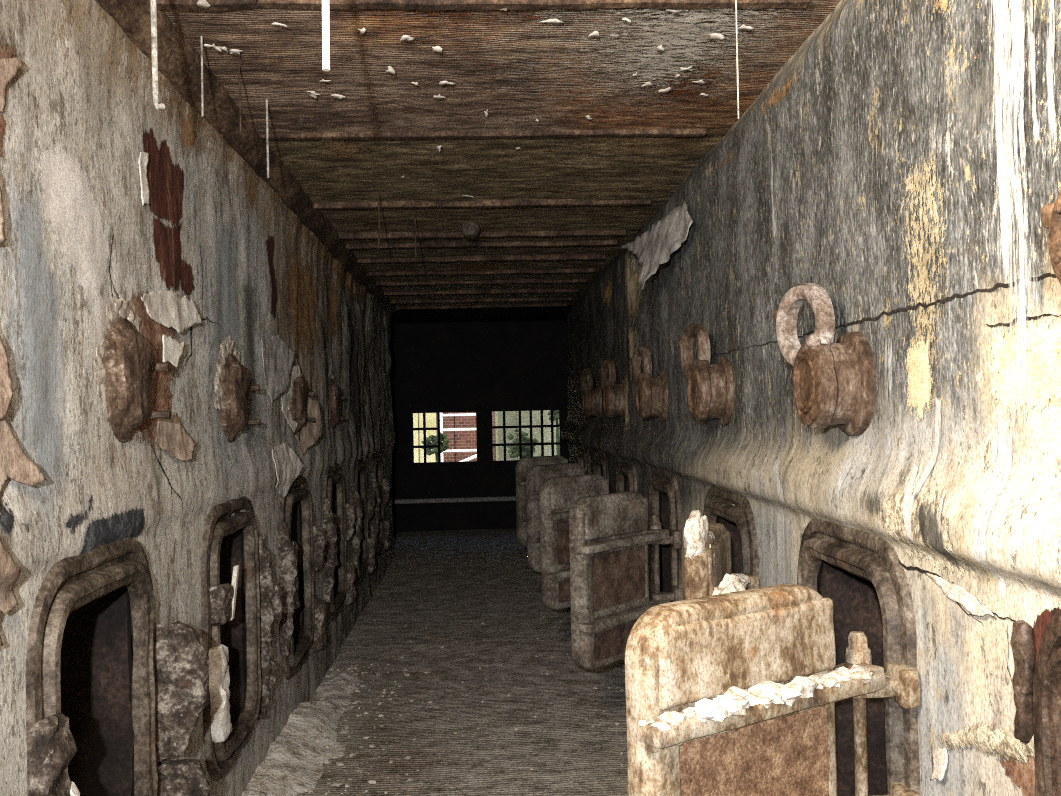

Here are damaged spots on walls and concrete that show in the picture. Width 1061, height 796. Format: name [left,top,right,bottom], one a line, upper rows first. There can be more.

peeling [0,33,25,157]
water stain [957,0,1057,422]
peeling [603,201,693,430]
crack [712,273,1061,357]
water stain [884,340,892,406]
peeling [0,336,46,616]
peeling [64,495,145,556]
water stain [902,398,941,545]
crack [898,559,1016,625]
water stain [971,426,1012,601]